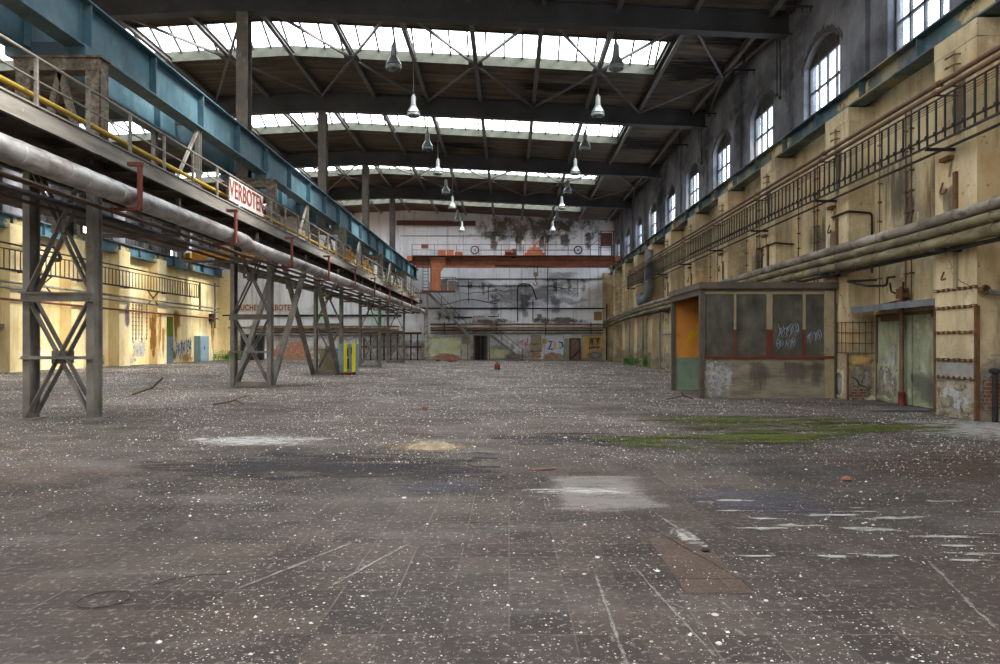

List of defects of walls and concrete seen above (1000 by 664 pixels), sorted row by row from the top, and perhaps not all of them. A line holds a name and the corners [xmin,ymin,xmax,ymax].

leakage [479,216,598,250]
corrosion [149,311,181,356]
flaking render [836,346,898,404]
flaking render [936,375,1000,421]